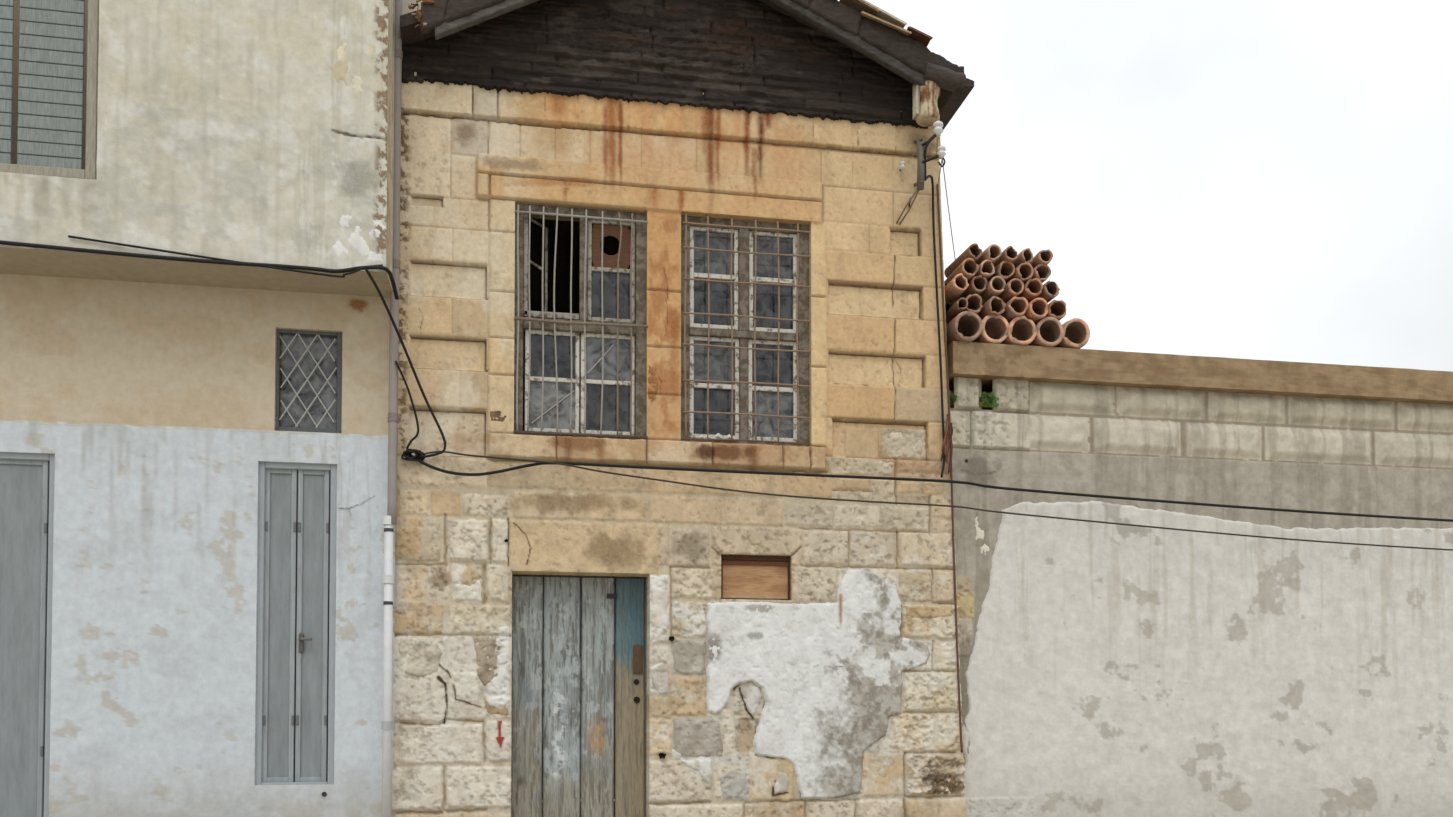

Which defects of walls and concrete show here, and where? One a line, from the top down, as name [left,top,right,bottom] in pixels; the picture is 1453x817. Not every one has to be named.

peeling [329,0,408,262]
corrosion [605,99,623,171]
corrosion [708,110,720,179]
corrosion [744,112,770,162]
spalling [398,270,406,449]
peeling [649,568,930,799]